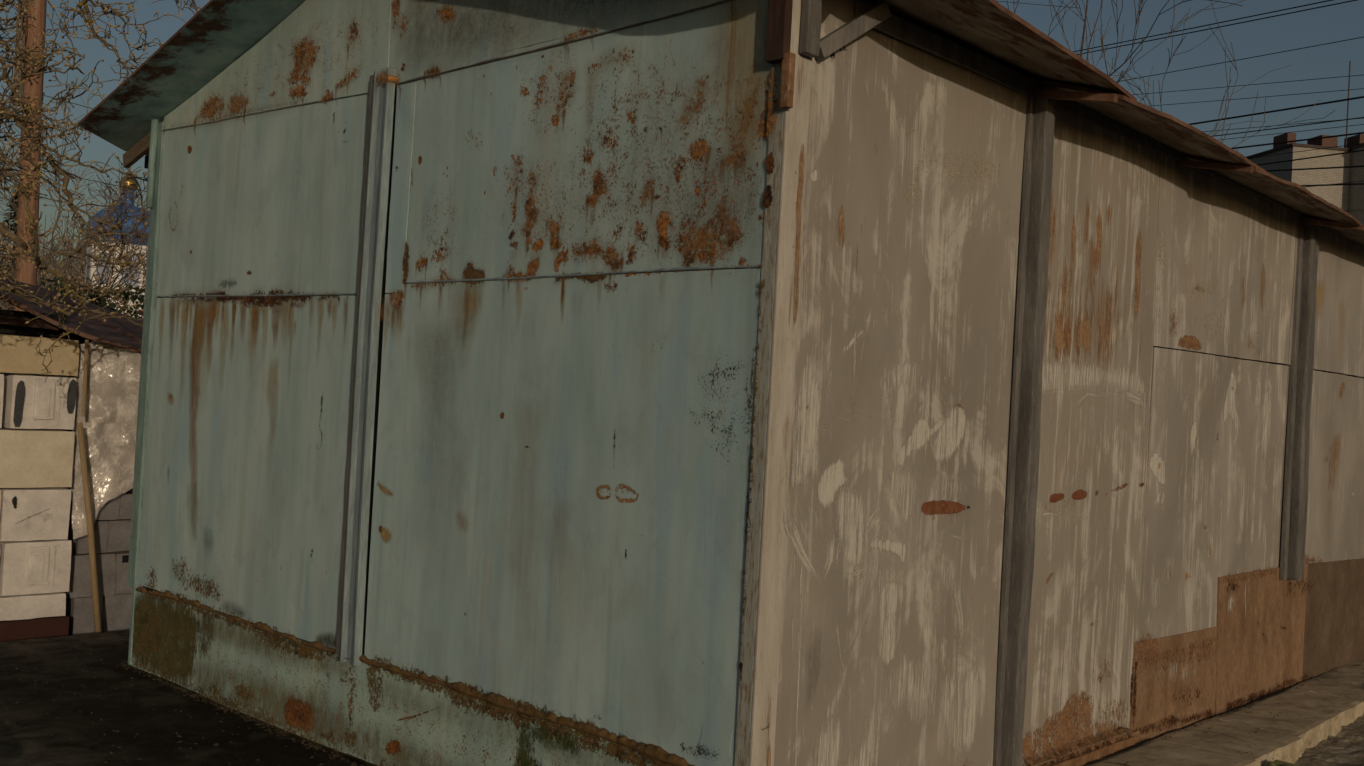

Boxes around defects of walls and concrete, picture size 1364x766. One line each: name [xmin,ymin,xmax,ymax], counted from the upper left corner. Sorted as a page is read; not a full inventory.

corrosion [186,16,377,120]
corrosion [391,0,408,37]
corrosion [475,27,779,303]
corrosion [388,197,485,311]
corrosion [1043,193,1142,369]
corrosion [166,290,348,448]
corrosion [921,500,970,520]
corrosion [1042,483,1144,520]
corrosion [133,556,673,766]